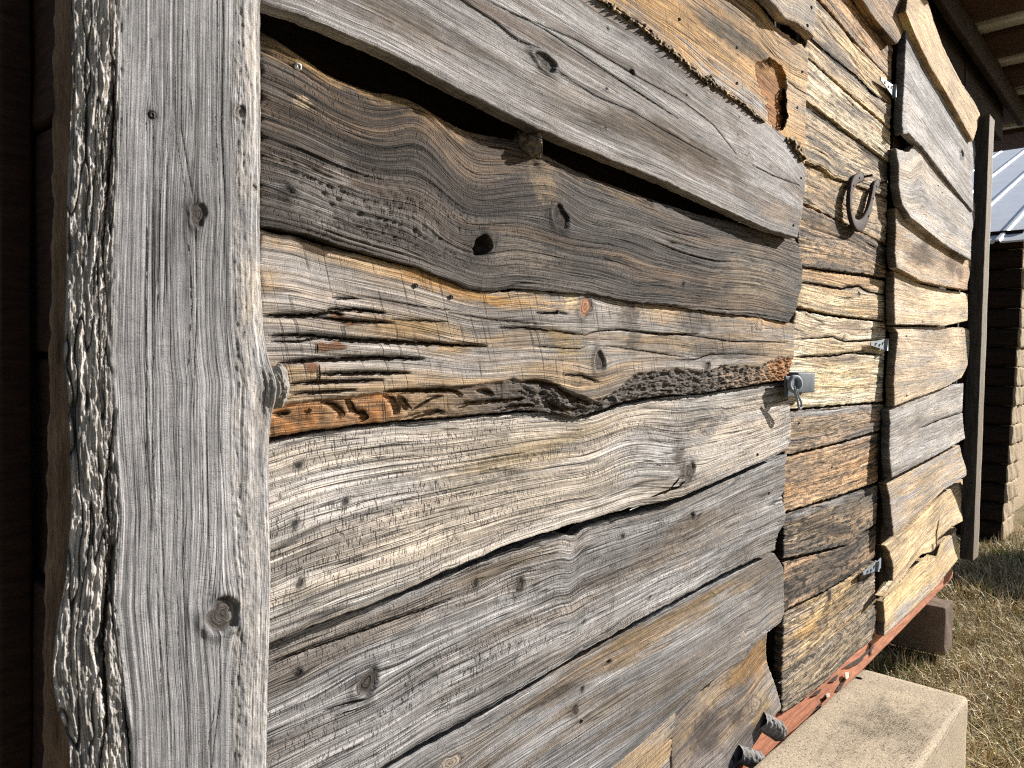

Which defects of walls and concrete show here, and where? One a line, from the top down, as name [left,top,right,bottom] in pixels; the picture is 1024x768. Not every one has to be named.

crack [265,296,878,395]
crack [651,478,686,497]